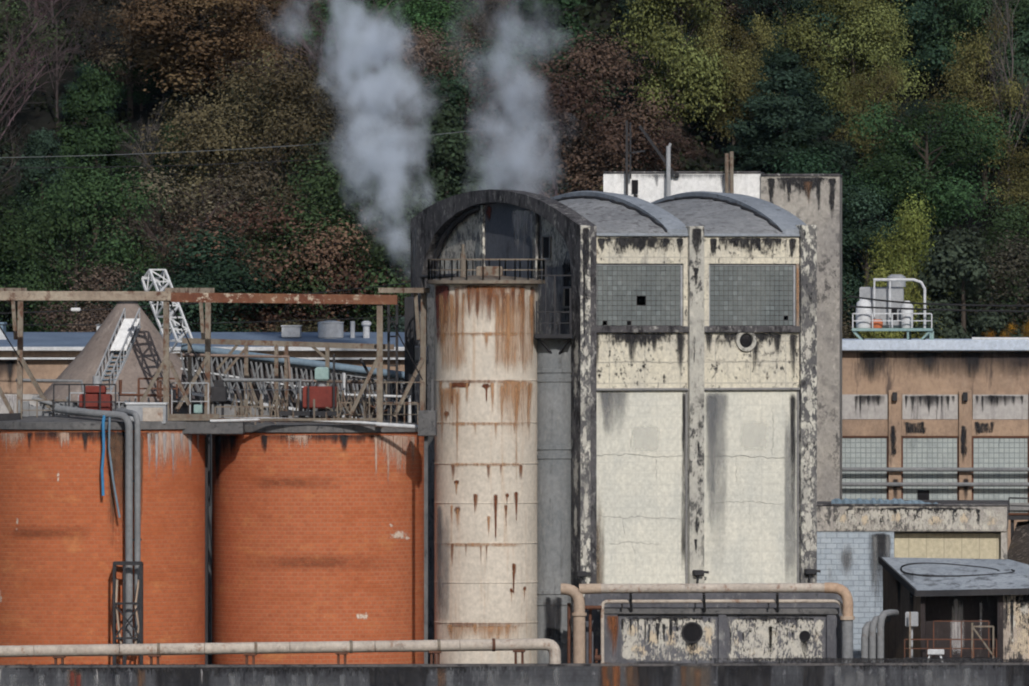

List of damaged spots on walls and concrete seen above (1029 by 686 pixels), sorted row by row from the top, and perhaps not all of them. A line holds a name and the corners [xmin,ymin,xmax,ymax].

leakage [767,177,836,211]
rust [435,285,534,365]
leakage [860,352,1029,378]
rust [439,380,532,441]
leakage [1,431,199,512]
rust [452,454,522,492]
rust [451,492,518,558]
spalling [573,426,589,571]
peeling [833,509,1003,531]
peeling [621,618,716,661]
peeling [729,618,824,661]
leakage [0,664,559,686]